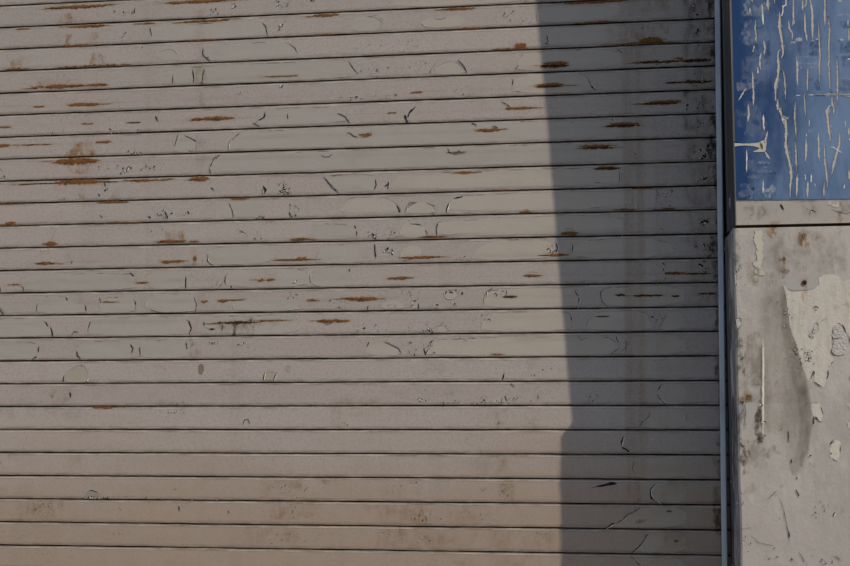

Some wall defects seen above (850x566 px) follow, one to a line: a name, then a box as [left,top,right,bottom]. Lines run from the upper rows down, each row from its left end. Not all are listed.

peeling [783,274,850,387]
peeling [811,402,824,422]
crack [743,432,839,563]